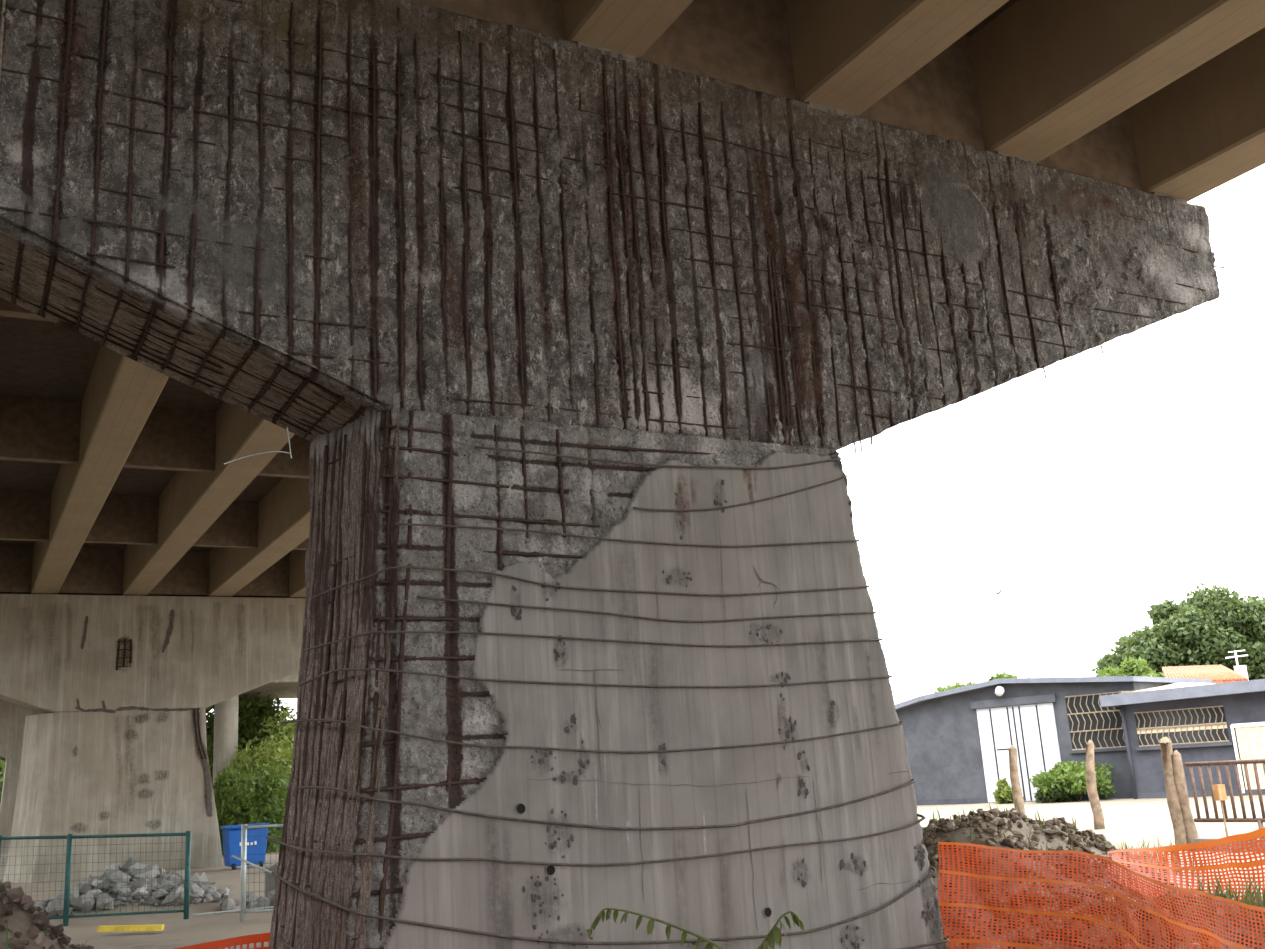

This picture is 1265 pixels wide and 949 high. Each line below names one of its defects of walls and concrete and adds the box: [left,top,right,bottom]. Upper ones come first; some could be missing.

rust [601,90,666,319]
spalling [0,0,1228,726]
spalling [269,670,508,949]
peeling [523,875,593,949]
peeling [545,808,574,858]
peeling [531,749,590,786]